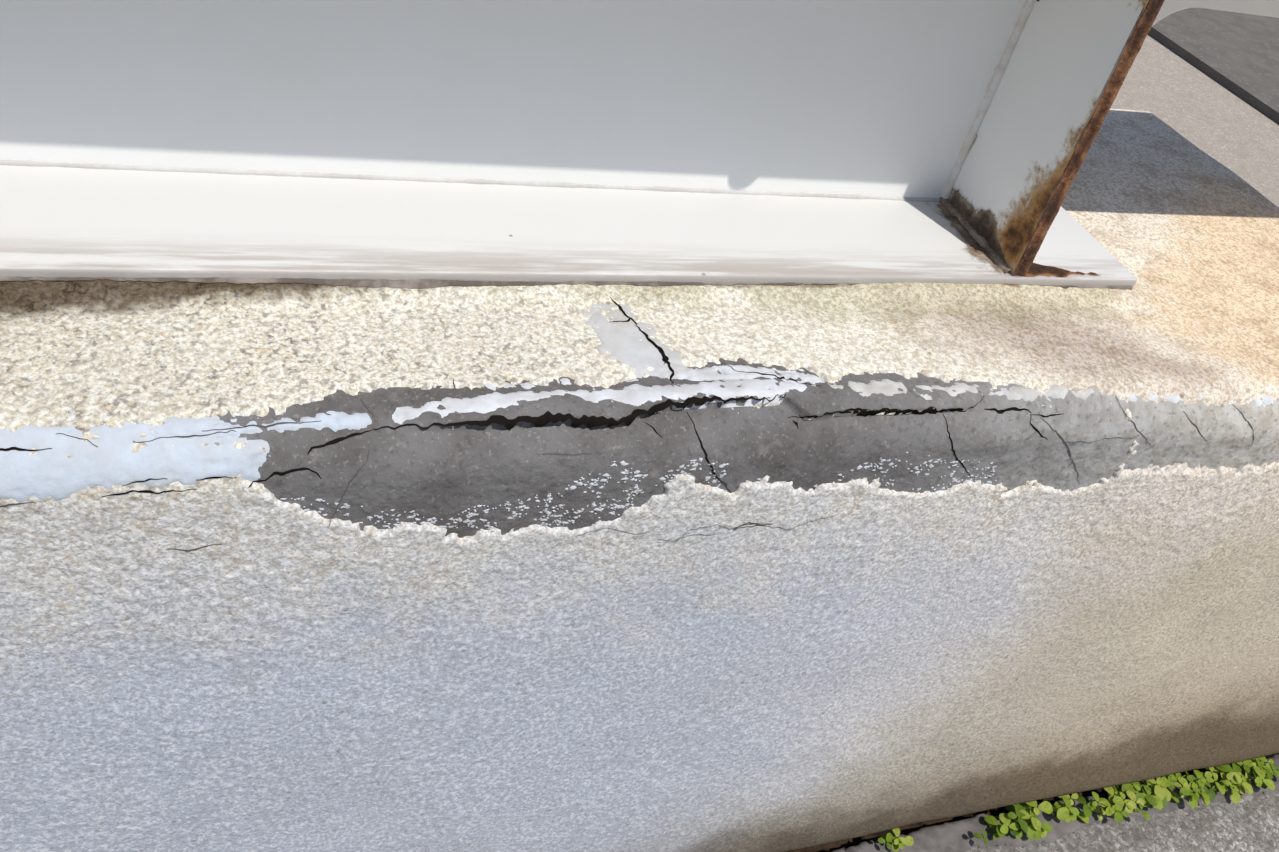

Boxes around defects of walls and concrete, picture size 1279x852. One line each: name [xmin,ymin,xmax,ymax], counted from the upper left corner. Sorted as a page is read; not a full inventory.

corrosion [938,0,1165,277]
crack [0,433,98,451]
crack [102,298,1151,526]
spalling [0,304,1279,538]
crack [578,514,838,542]